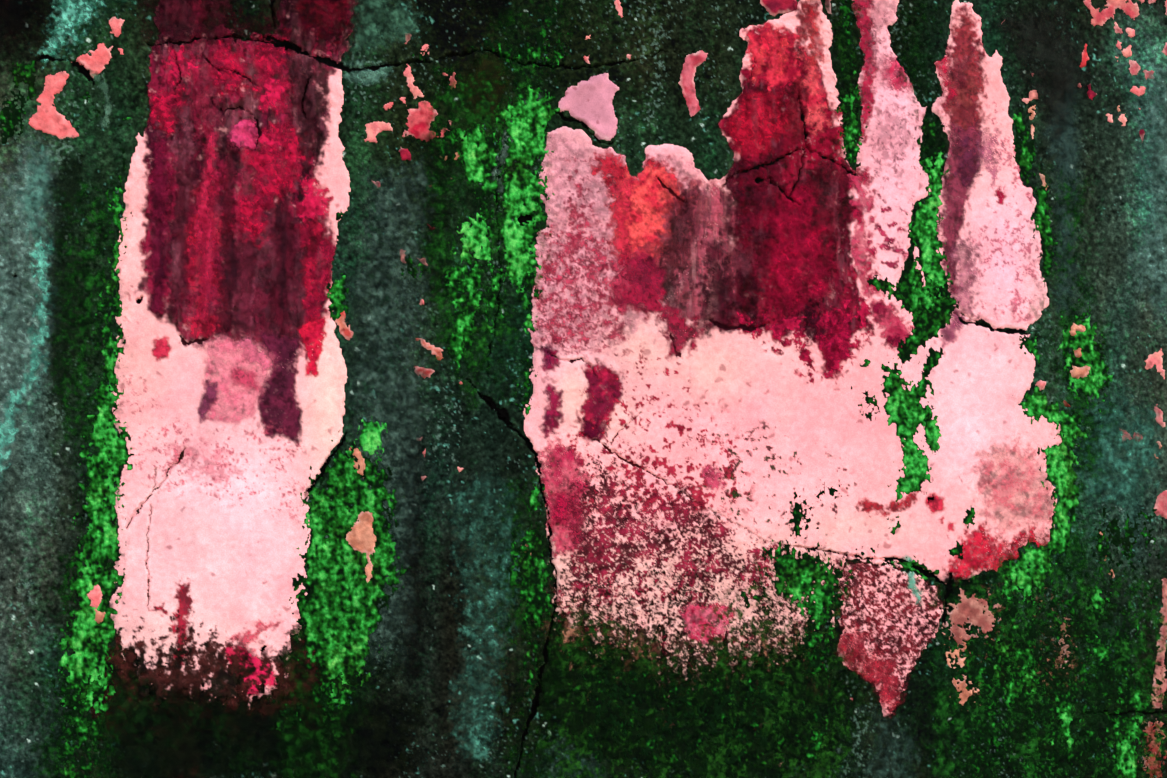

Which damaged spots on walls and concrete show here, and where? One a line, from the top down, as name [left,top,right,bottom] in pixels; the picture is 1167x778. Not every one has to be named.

peeling [29,71,79,139]
peeling [305,50,351,247]
crack [147,0,655,150]
leakage [493,94,541,192]
leakage [852,0,912,143]
peeling [87,132,366,706]
crack [474,140,557,778]
crack [585,418,702,505]
peeling [517,0,1062,717]
leakage [533,48,1053,778]
crack [751,532,953,629]
leakage [93,583,422,778]